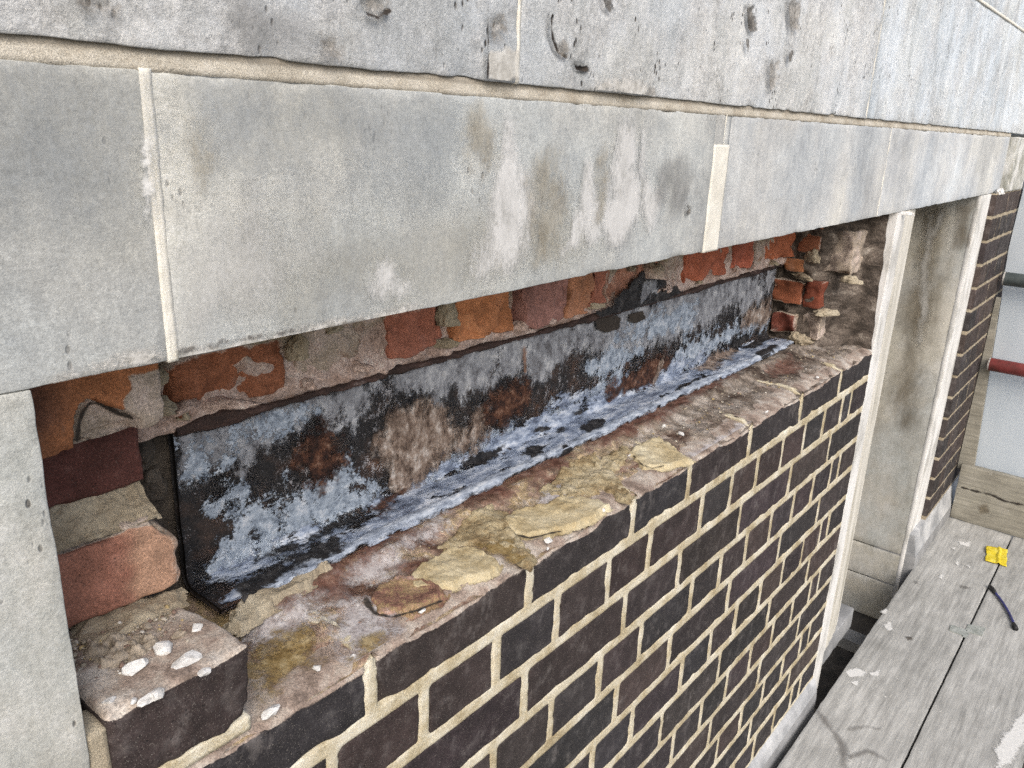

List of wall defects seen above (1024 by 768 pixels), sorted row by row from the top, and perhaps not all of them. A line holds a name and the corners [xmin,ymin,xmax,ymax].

damp [477,120,533,277]
damp [570,125,661,247]
spalling [53,348,166,383]
spalling [178,304,418,357]
corrosion [368,348,532,517]
peeling [462,445,504,467]
damp [173,265,794,699]
corrosion [466,453,572,504]
peeling [518,445,547,456]
peeling [573,406,606,432]
corrosion [596,348,739,440]
corrosion [312,529,411,602]